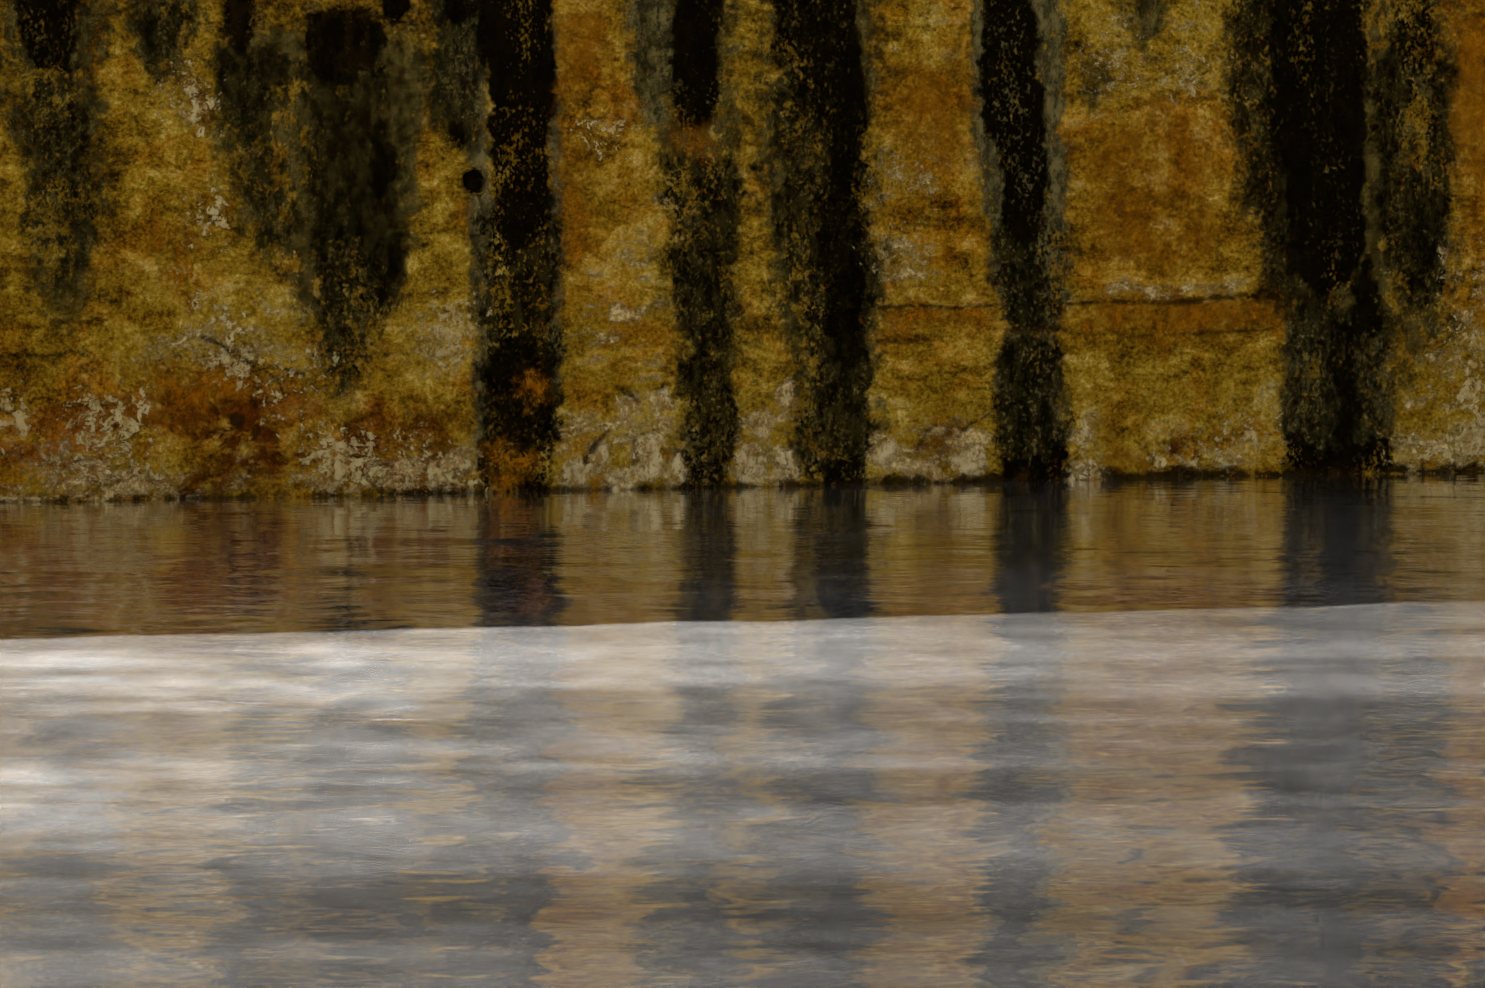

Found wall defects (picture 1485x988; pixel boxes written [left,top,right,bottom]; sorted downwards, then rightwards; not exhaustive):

leakage [0,0,202,311]
leakage [170,0,611,497]
leakage [623,0,1485,490]
leakage [0,370,261,502]
corrosion [114,363,300,498]